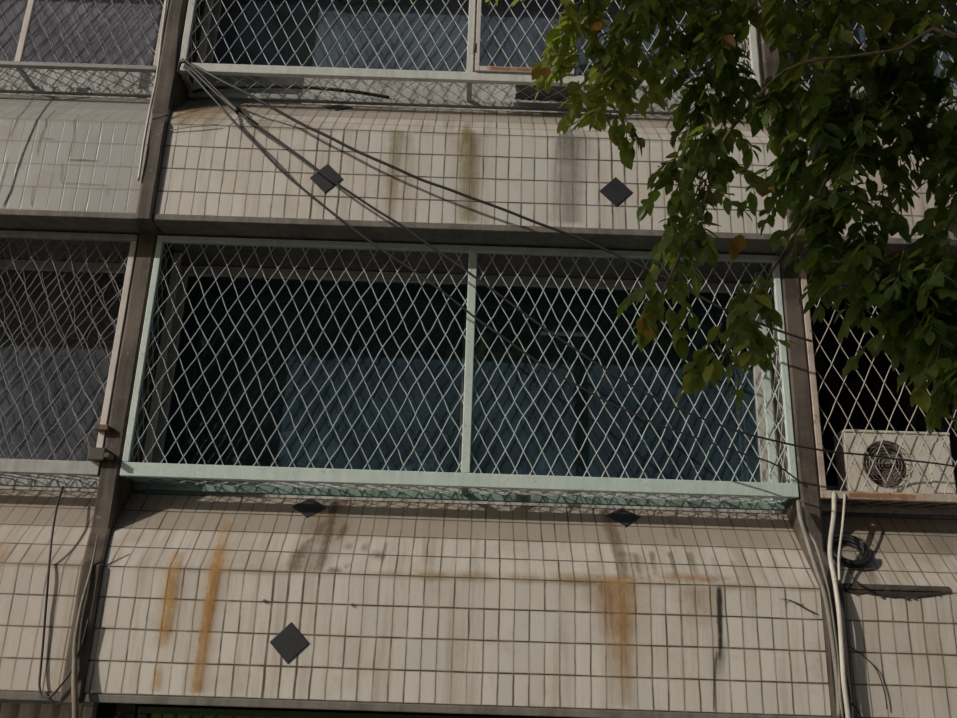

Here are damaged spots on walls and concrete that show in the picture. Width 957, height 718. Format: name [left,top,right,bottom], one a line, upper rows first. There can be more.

crack [0,95,107,205]
rust [196,560,220,689]